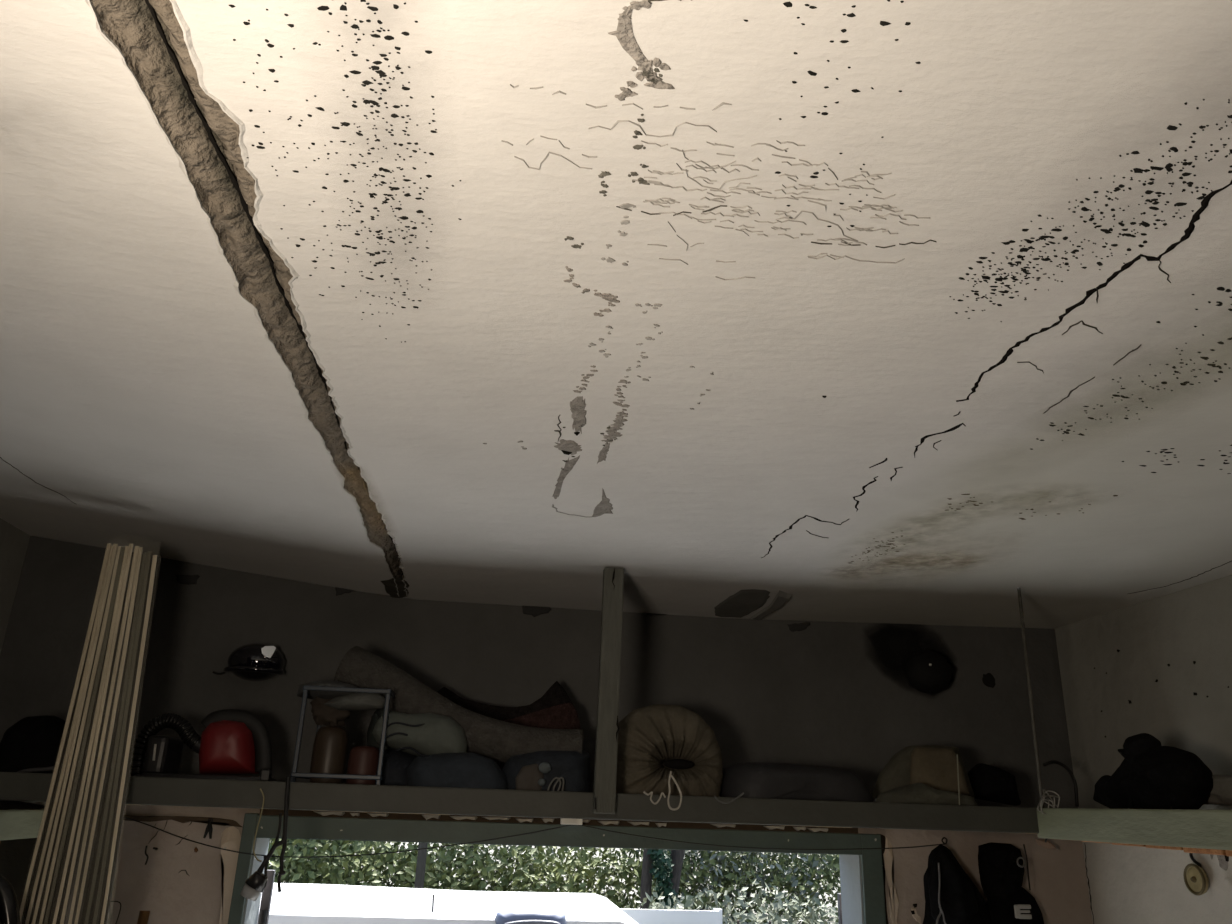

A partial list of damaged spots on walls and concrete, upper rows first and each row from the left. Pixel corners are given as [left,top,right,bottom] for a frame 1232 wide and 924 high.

water stain [247,0,437,339]
crack [501,84,936,280]
water stain [949,99,1232,319]
crack [762,180,1232,558]
water stain [1049,337,1232,441]
crack [1128,561,1232,594]